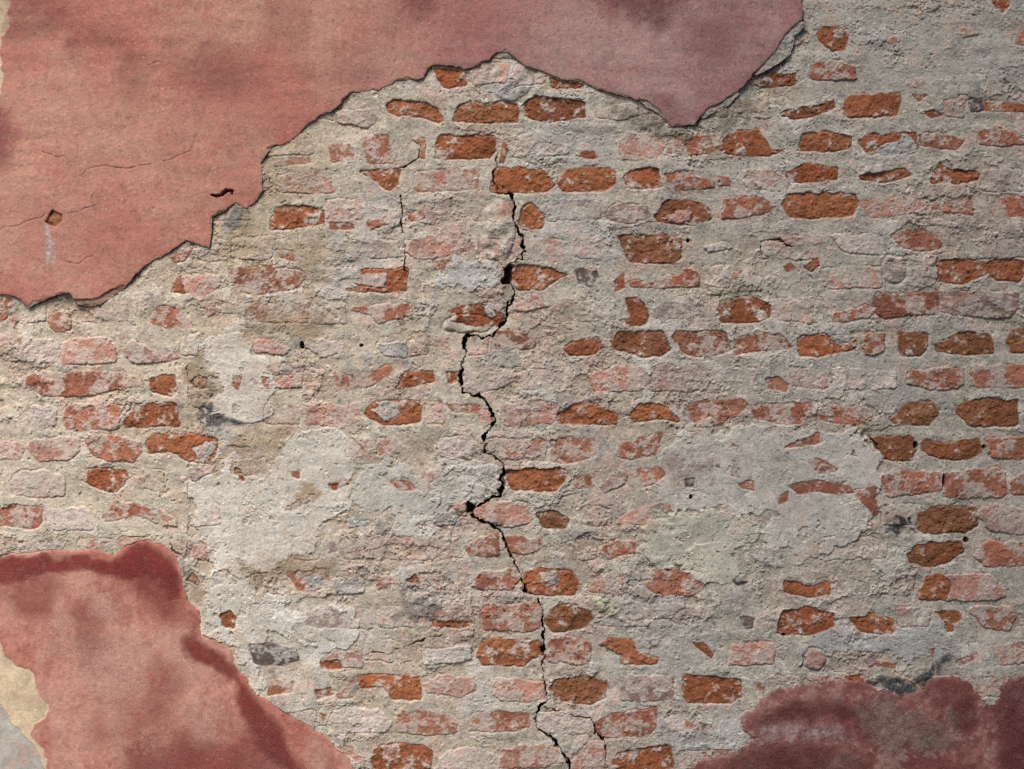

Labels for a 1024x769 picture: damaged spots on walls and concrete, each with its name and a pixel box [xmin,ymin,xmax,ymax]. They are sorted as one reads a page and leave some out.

peeling [0,0,806,307]
spalling [618,131,919,265]
spalling [781,93,903,120]
spalling [564,297,671,358]
spalling [898,328,1024,357]
spalling [125,374,219,464]
crack [451,153,607,769]
spalling [872,398,1024,462]
peeling [0,540,354,769]
spalling [777,581,895,637]
spalling [907,505,979,633]
peeling [612,675,1024,769]